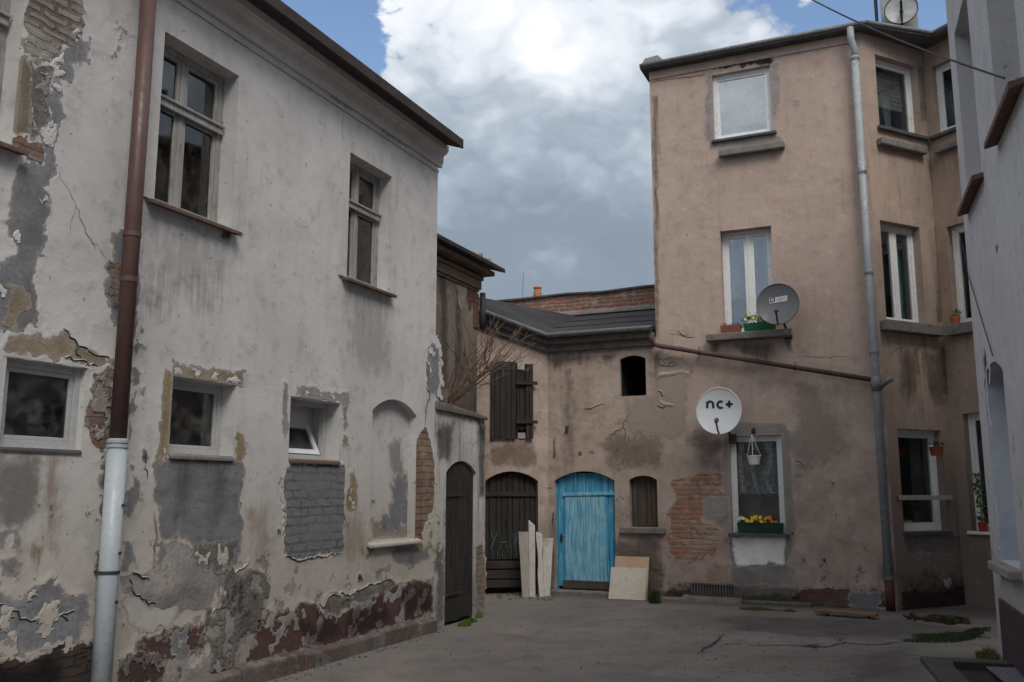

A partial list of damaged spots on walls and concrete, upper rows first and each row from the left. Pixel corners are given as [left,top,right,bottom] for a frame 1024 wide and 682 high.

peeling [0,0,137,682]
flaking render [127,231,250,466]
peeling [112,418,445,682]
flaking render [279,376,362,520]
spalling [421,332,444,406]
crack [609,331,695,443]
flaking render [659,465,727,572]
water stain [910,574,966,607]